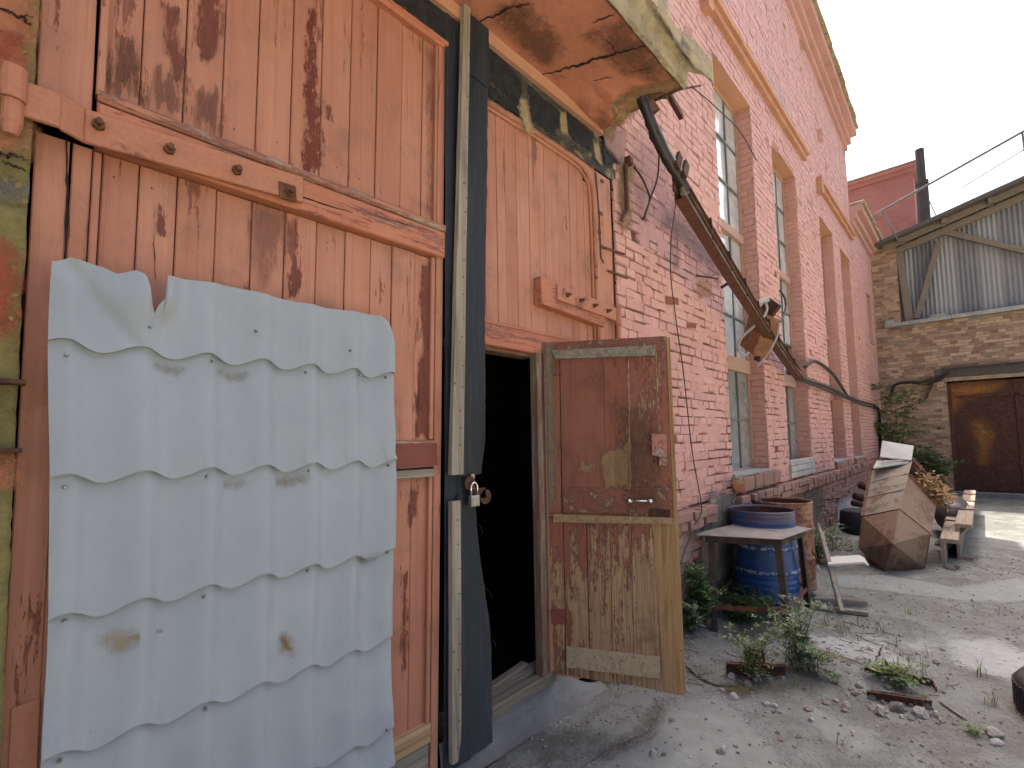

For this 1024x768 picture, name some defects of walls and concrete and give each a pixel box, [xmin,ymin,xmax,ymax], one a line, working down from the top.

peeling [106,0,226,137]
peeling [301,8,334,173]
crack [480,3,532,22]
crack [542,14,653,81]
peeling [285,217,304,298]
corrosion [951,383,993,409]
peeling [407,487,418,528]
peeling [400,571,409,680]